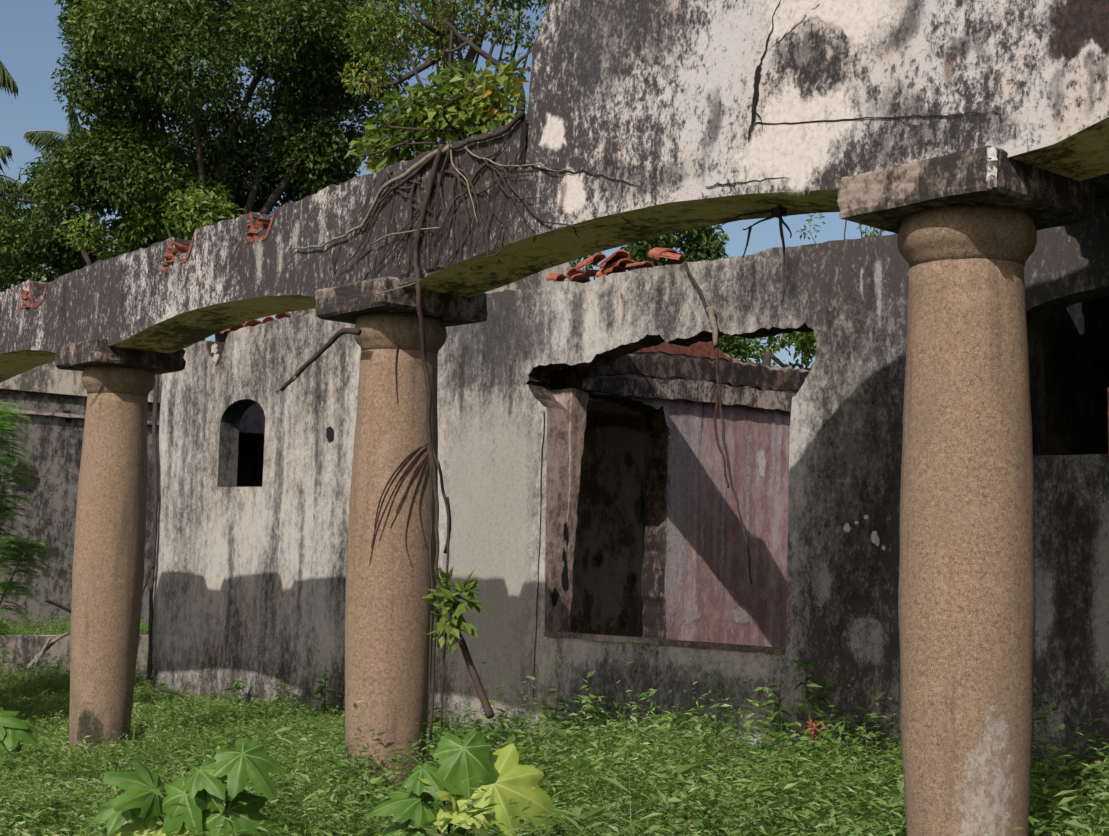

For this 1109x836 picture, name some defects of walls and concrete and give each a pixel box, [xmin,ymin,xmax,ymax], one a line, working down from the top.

leakage [1041,0,1109,60]
crack [748,0,998,146]
crack [705,174,789,188]
leakage [278,222,299,272]
leakage [1035,559,1054,655]